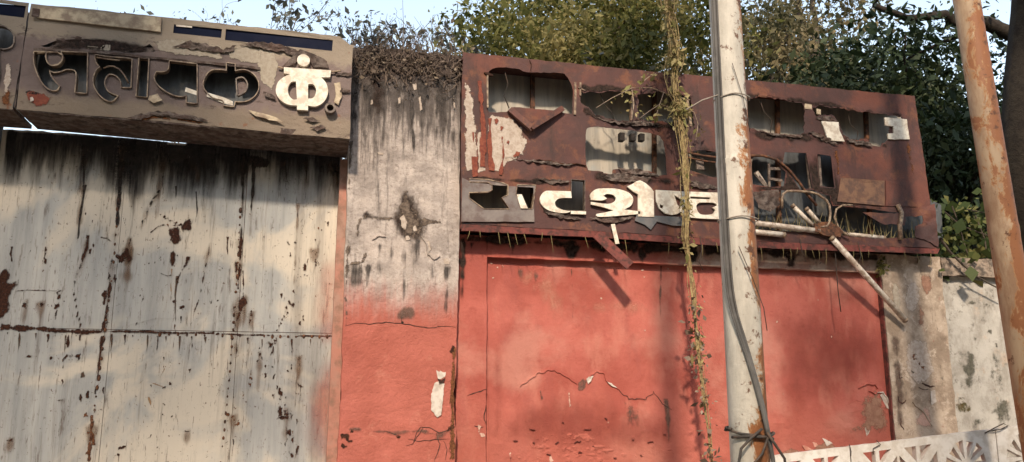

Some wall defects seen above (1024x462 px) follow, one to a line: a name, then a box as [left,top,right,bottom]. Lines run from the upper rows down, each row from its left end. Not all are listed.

water stain [352,75,457,151]
corrosion [77,155,111,269]
water stain [5,130,340,289]
water stain [94,276,112,394]
corrosion [0,190,331,458]
crack [346,318,452,328]
peeling [431,345,456,459]